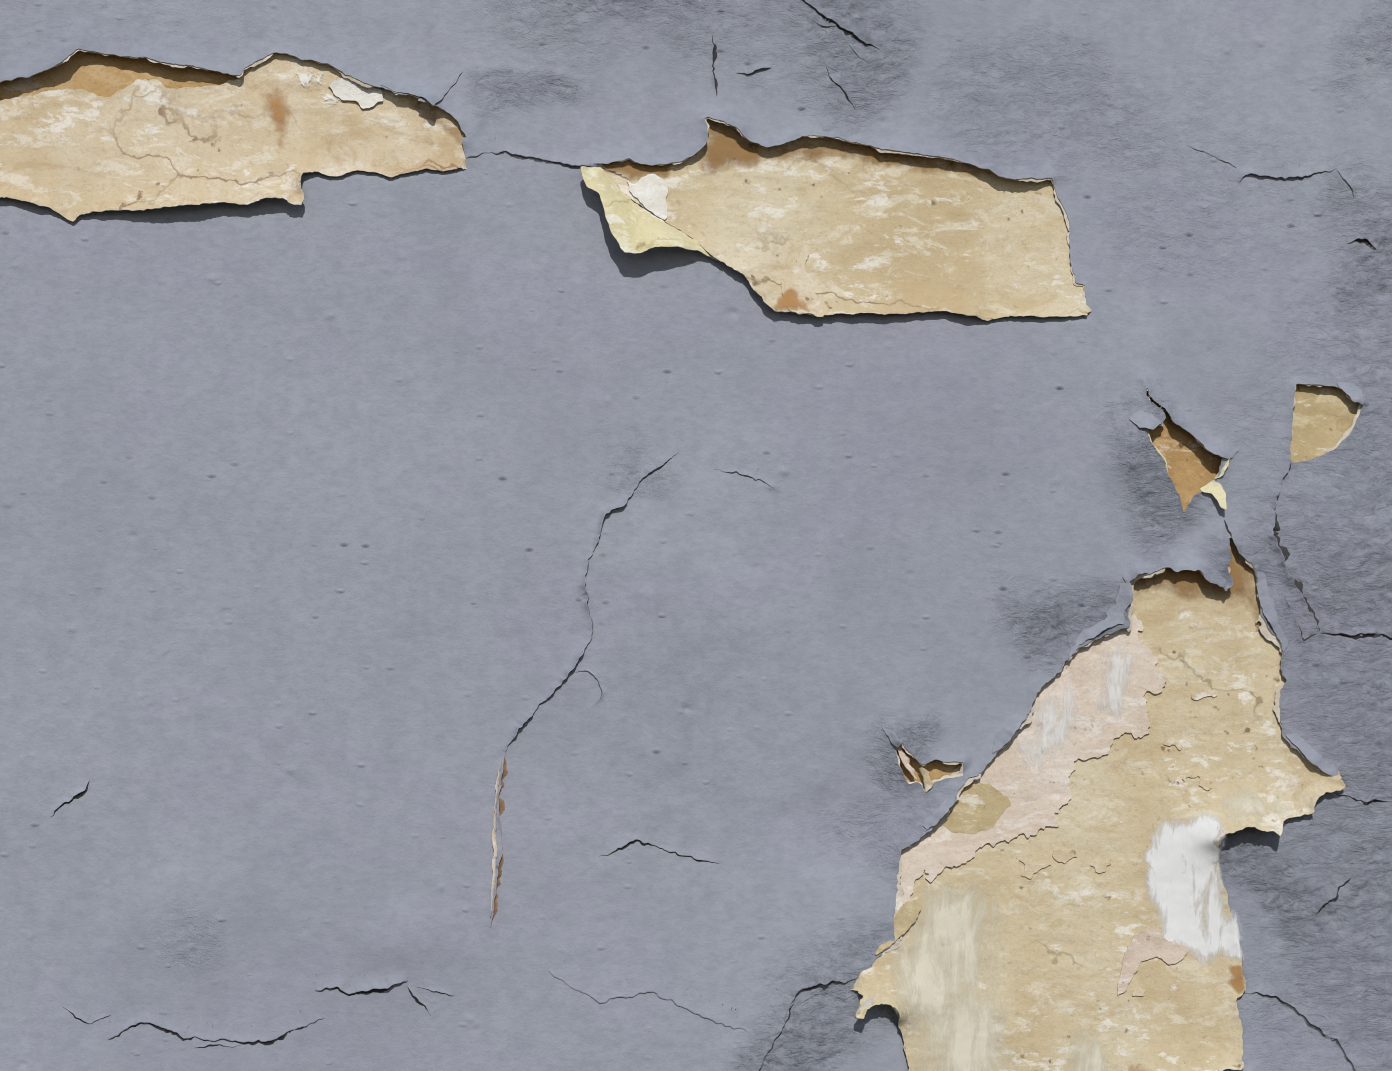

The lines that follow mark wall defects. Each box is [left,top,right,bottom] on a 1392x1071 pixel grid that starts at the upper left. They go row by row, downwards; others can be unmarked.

crack [802,0,887,110]
peeling [0,25,486,222]
peeling [574,92,1108,321]
crack [1187,130,1382,250]
peeling [1267,361,1378,480]
crack [1217,457,1392,653]
crack [479,443,679,927]
peeling [839,366,1364,1071]
crack [592,825,721,864]
crack [62,964,456,1048]
crack [548,955,862,1071]
crack [1244,977,1370,1071]